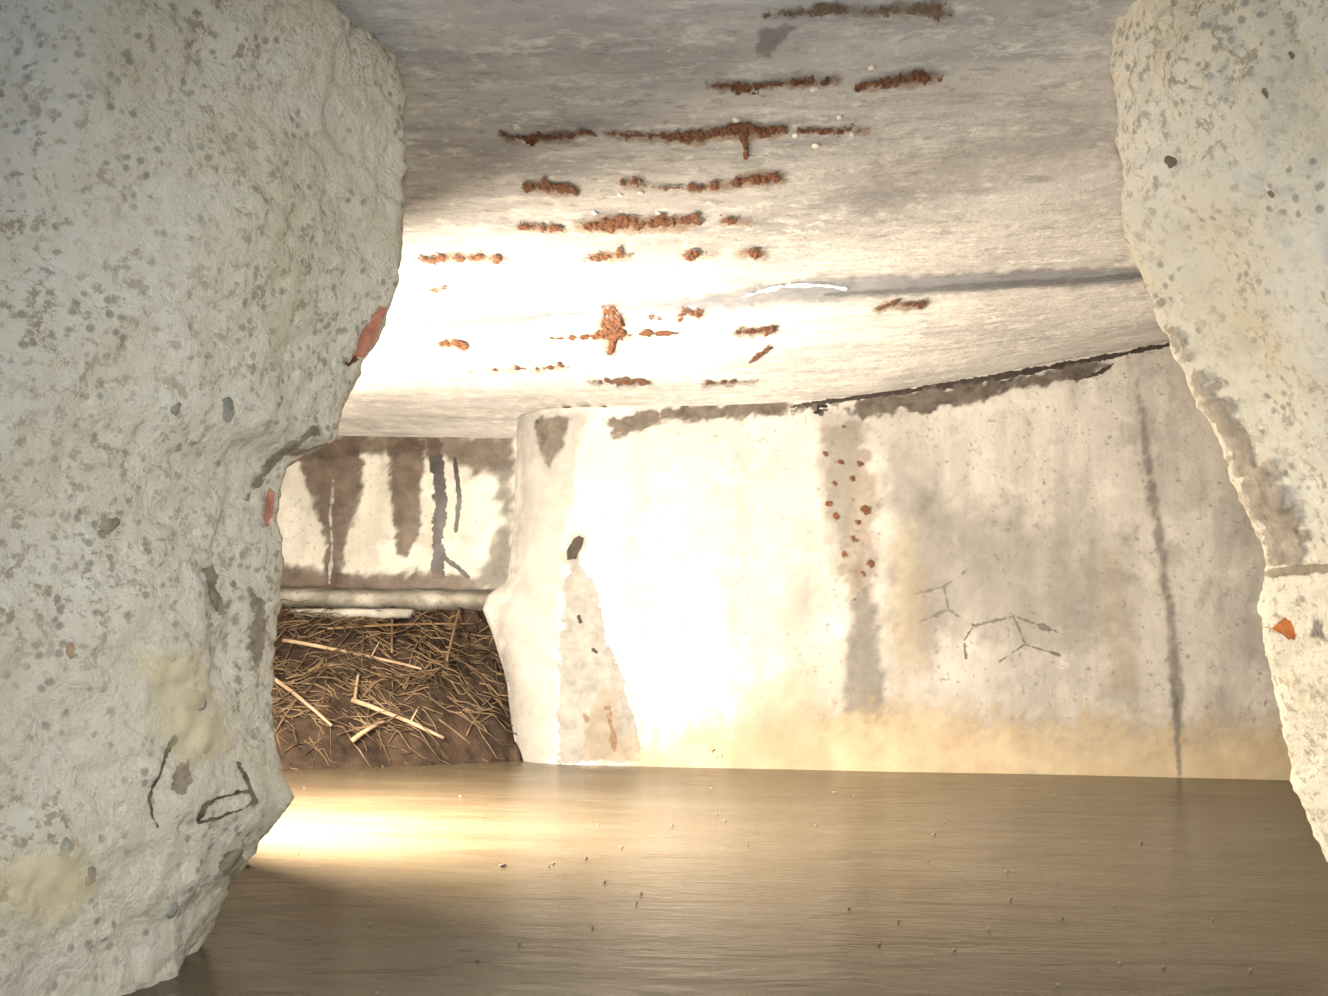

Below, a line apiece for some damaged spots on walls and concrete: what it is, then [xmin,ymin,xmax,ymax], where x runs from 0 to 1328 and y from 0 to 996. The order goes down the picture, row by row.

corrosion [705,75,839,95]
corrosion [854,65,943,92]
corrosion [499,115,862,197]
corrosion [517,211,703,262]
corrosion [549,303,704,356]
corrosion [733,324,777,364]
corrosion [870,299,926,311]
corrosion [592,377,649,387]
corrosion [822,442,869,558]
water stain [280,412,582,763]
water stain [635,408,1292,780]
crack [913,571,1064,663]